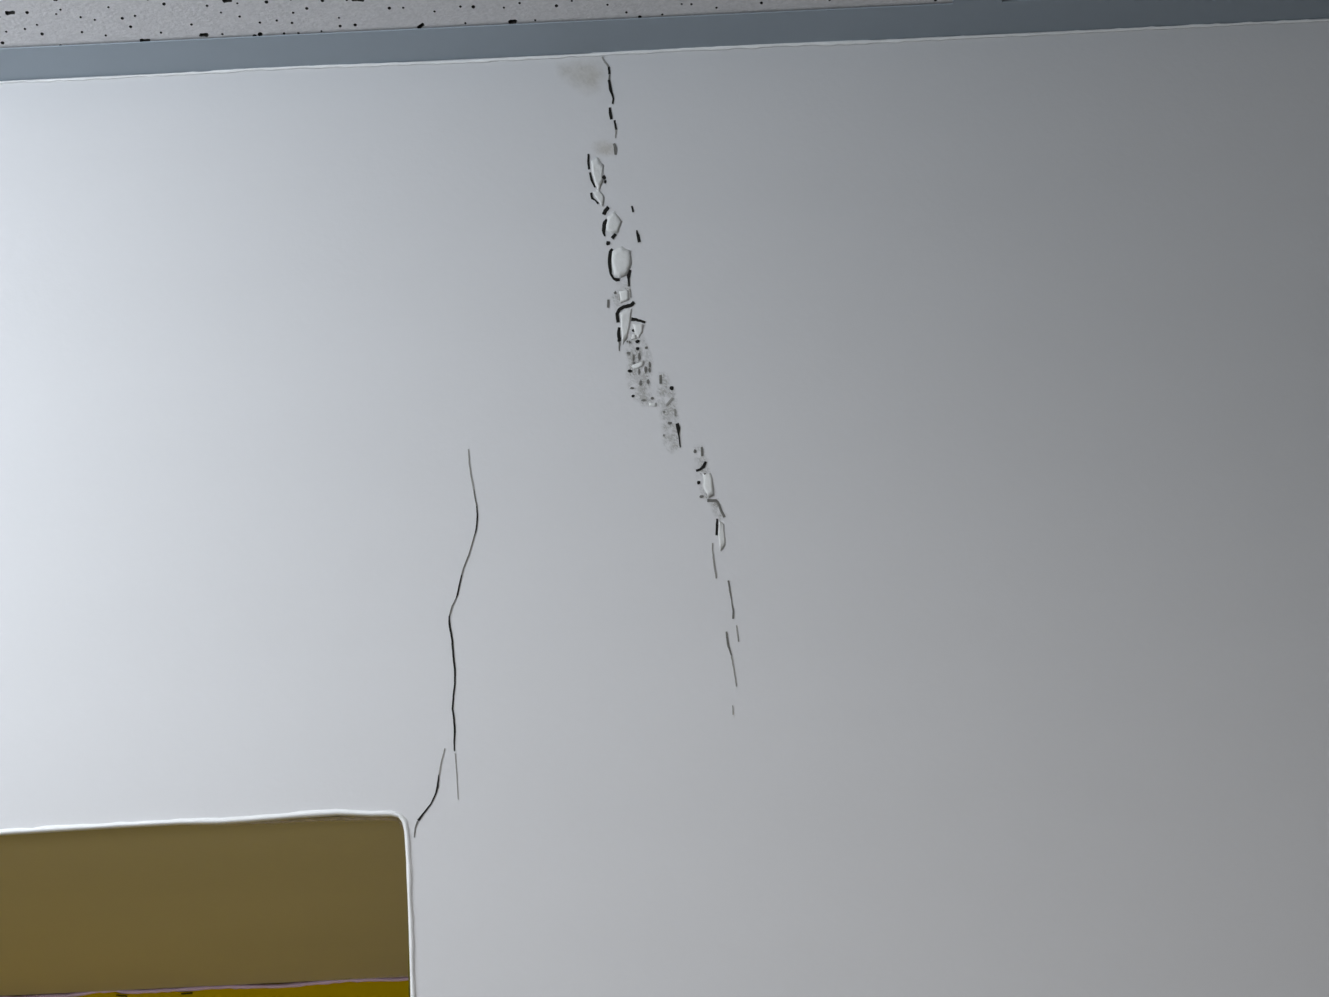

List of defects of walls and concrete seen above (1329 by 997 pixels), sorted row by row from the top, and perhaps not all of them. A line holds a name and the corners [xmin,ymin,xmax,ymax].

crack [587,57,645,351]
crack [414,449,478,837]
crack [659,375,739,715]